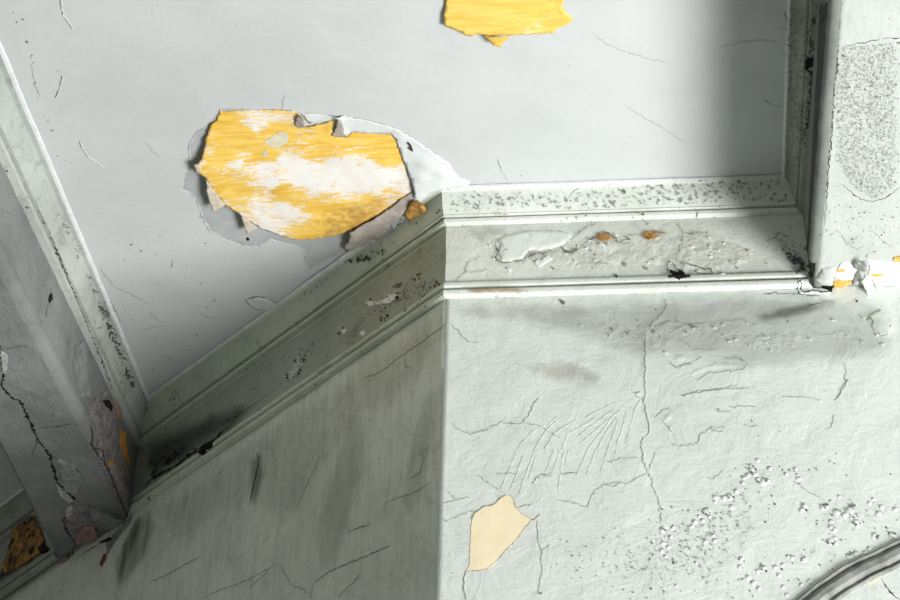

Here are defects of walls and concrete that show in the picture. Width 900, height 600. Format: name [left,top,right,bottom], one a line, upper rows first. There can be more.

peeling [444,0,573,47]
peeling [180,108,470,269]
crack [455,210,702,282]
peeling [798,256,900,295]
crack [365,324,478,378]
crack [556,300,758,513]
crack [0,345,100,559]
flaking render [56,342,133,567]
crack [391,458,476,522]
peeling [0,517,49,579]
crack [209,545,390,598]
peeling [466,495,532,571]